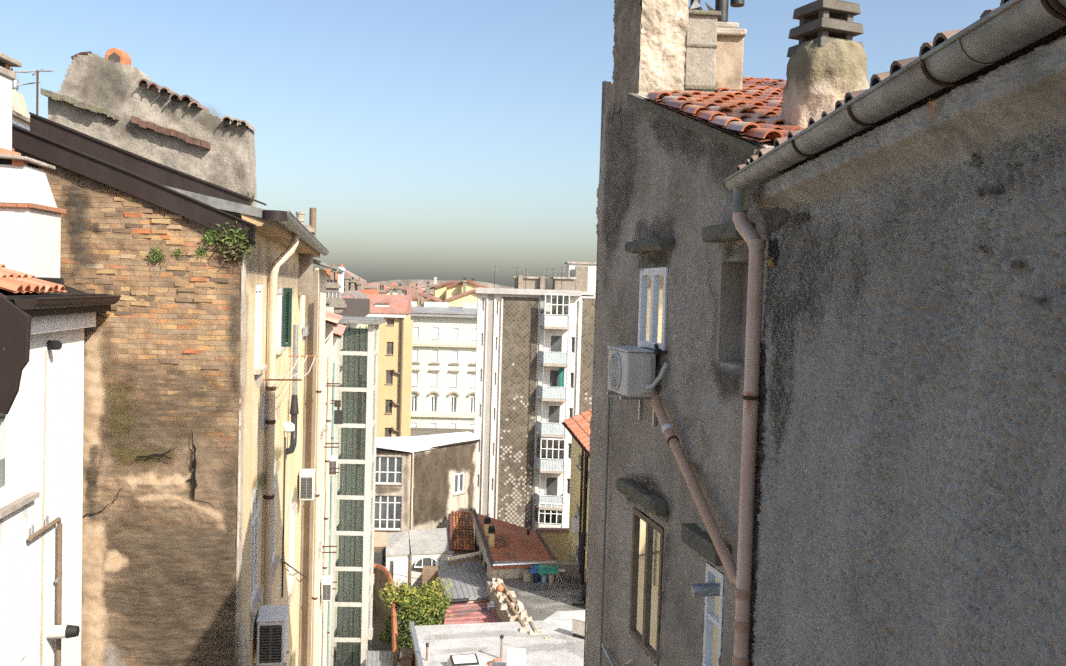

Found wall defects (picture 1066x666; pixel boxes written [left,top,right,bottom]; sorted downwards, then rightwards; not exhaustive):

damp [109,366,225,463]
crack [136,429,217,509]
damp [86,445,242,666]